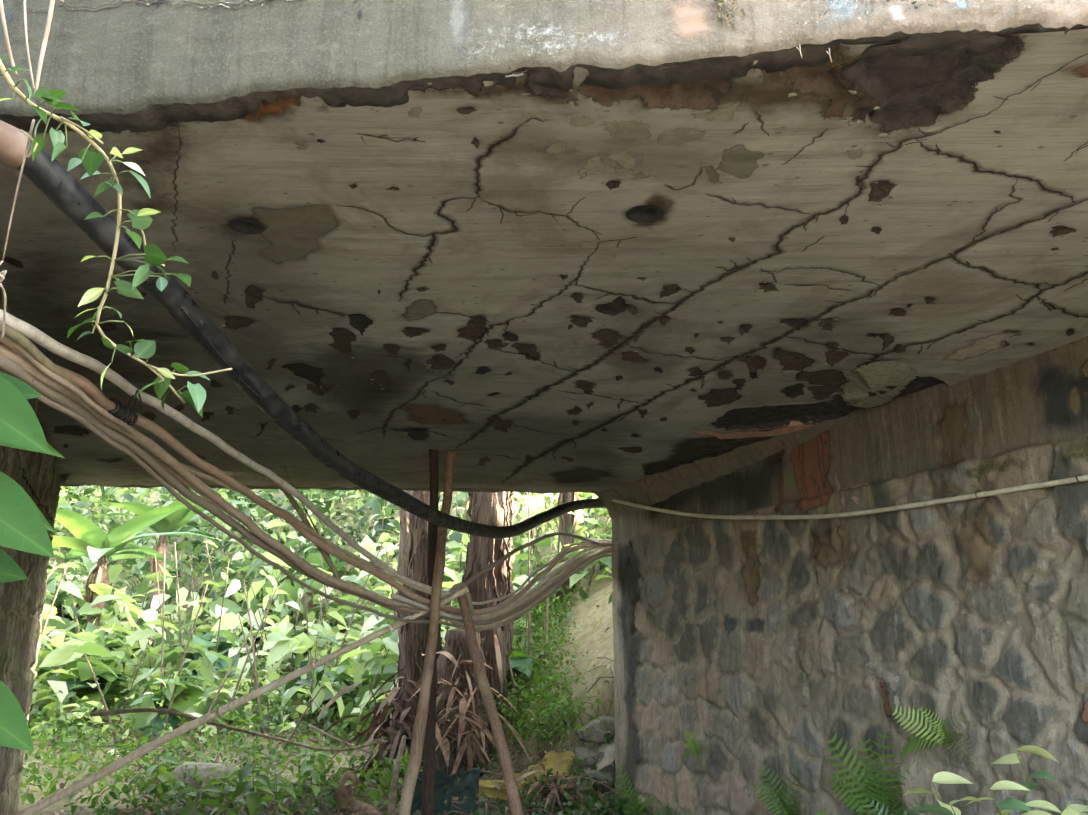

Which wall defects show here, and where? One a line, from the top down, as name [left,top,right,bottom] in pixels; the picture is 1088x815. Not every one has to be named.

spalling [745,35,1025,136]
crack [172,123,182,252]
water stain [637,196,671,226]
crack [224,239,236,304]
crack [262,296,366,317]
spalling [328,315,373,358]
spalling [383,316,542,385]
spalling [565,293,662,373]
crack [338,54,1088,483]
spalling [688,319,949,432]
water stain [1039,368,1088,426]
corrosion [775,431,833,514]